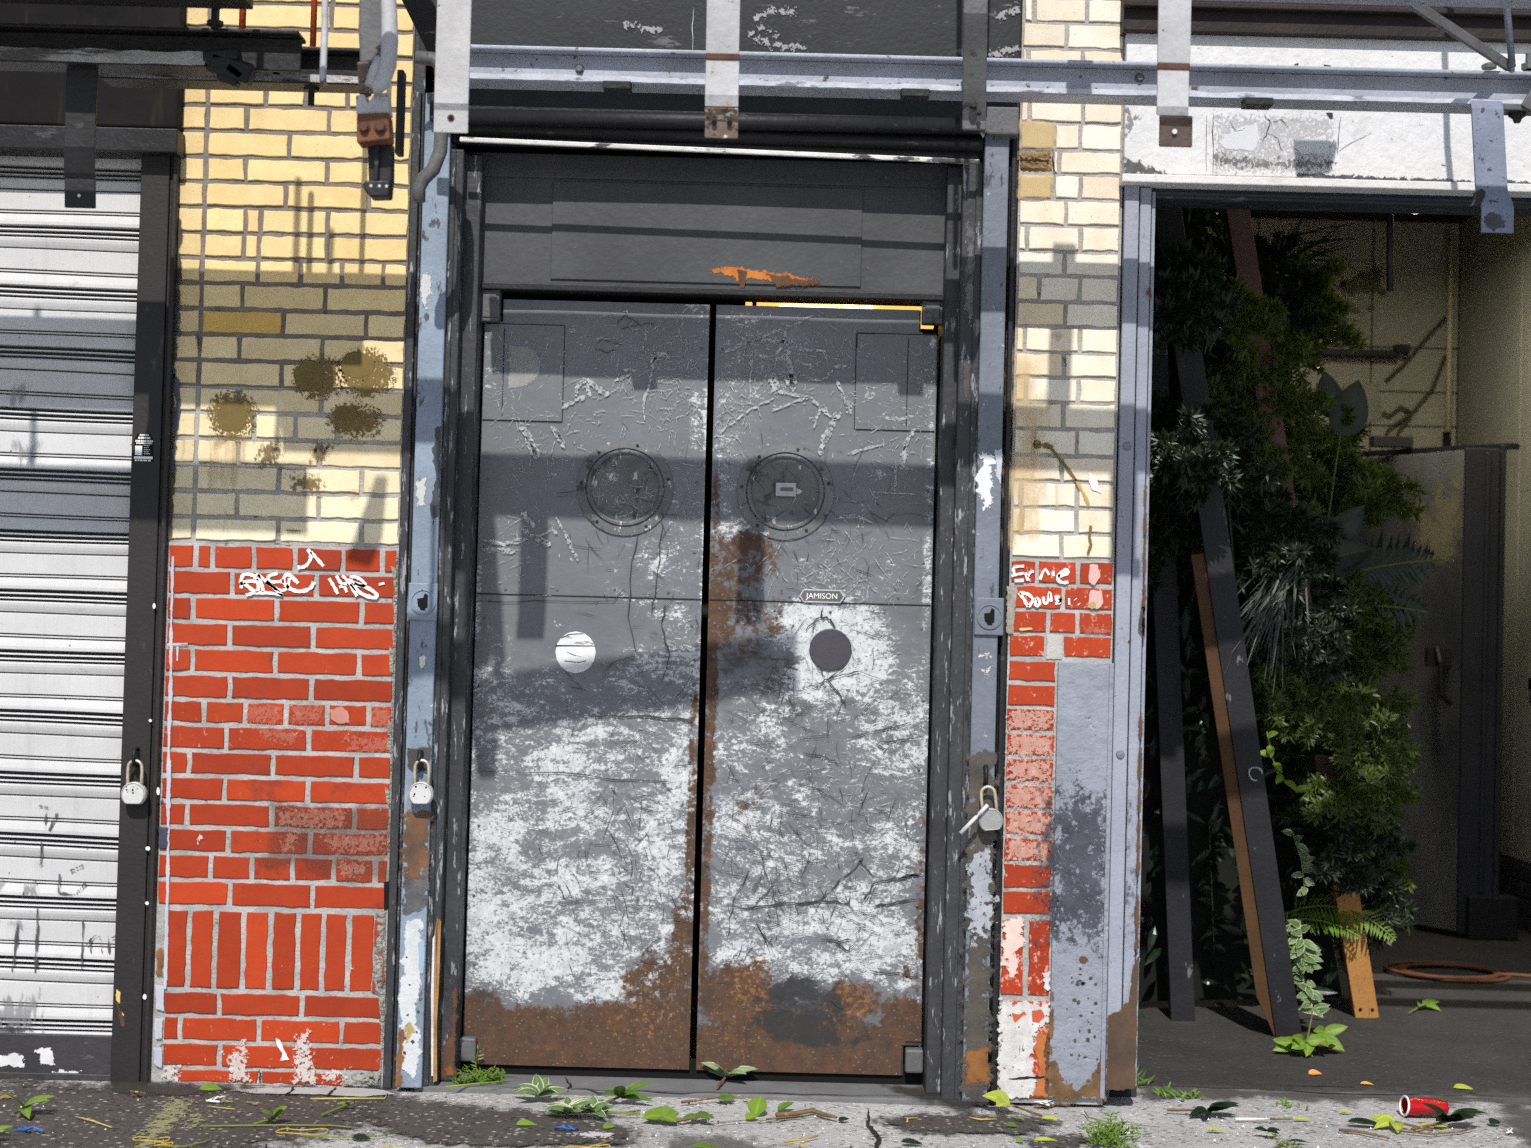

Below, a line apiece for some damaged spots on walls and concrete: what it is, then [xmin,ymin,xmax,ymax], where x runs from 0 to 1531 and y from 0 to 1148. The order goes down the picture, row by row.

corrosion [712,266,820,288]
water stain [253,437,339,498]
corrosion [1138,485,1148,639]
peeling [276,869,435,1089]
peeling [1001,916,1026,978]
peeling [996,956,1098,1099]
corrosion [1033,713,1143,1107]